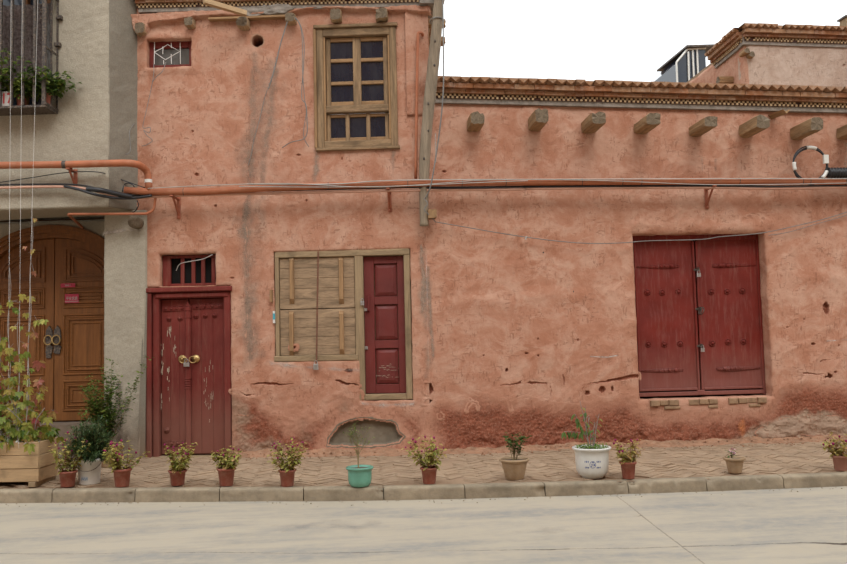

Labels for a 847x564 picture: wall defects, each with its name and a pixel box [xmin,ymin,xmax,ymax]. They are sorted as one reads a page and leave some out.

crack [228,47,296,416]
crack [464,397,481,414]
flaking render [232,377,847,453]
crack [497,371,641,413]